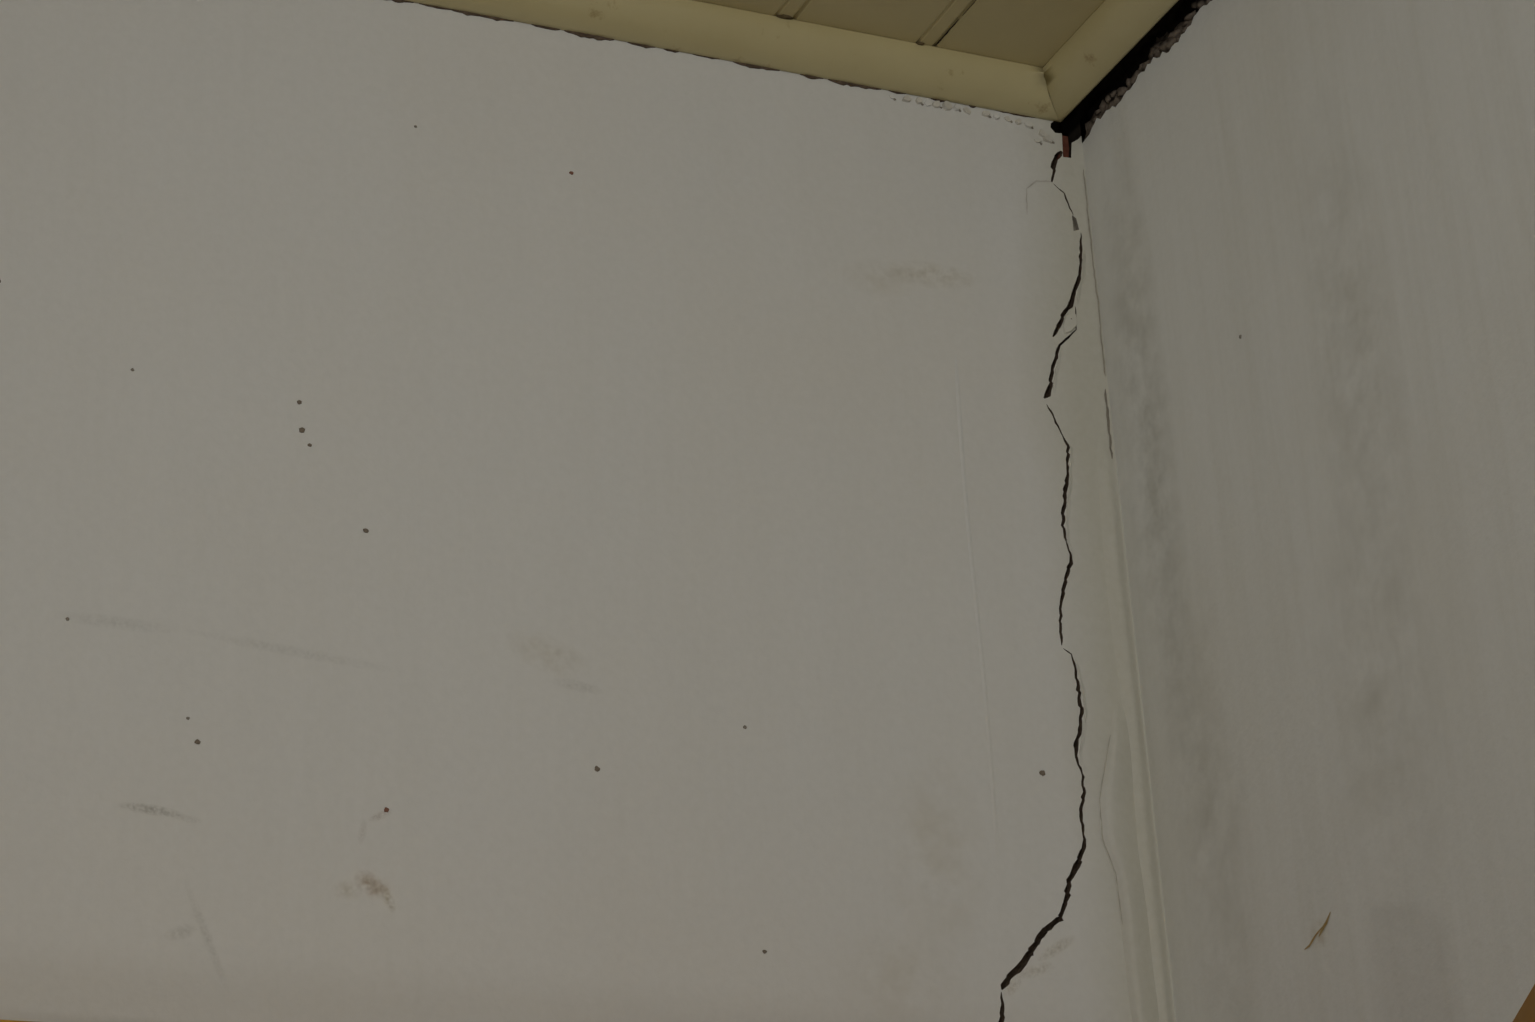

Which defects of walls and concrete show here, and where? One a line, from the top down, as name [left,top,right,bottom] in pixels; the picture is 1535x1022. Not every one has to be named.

crack [392,0,1113,1022]